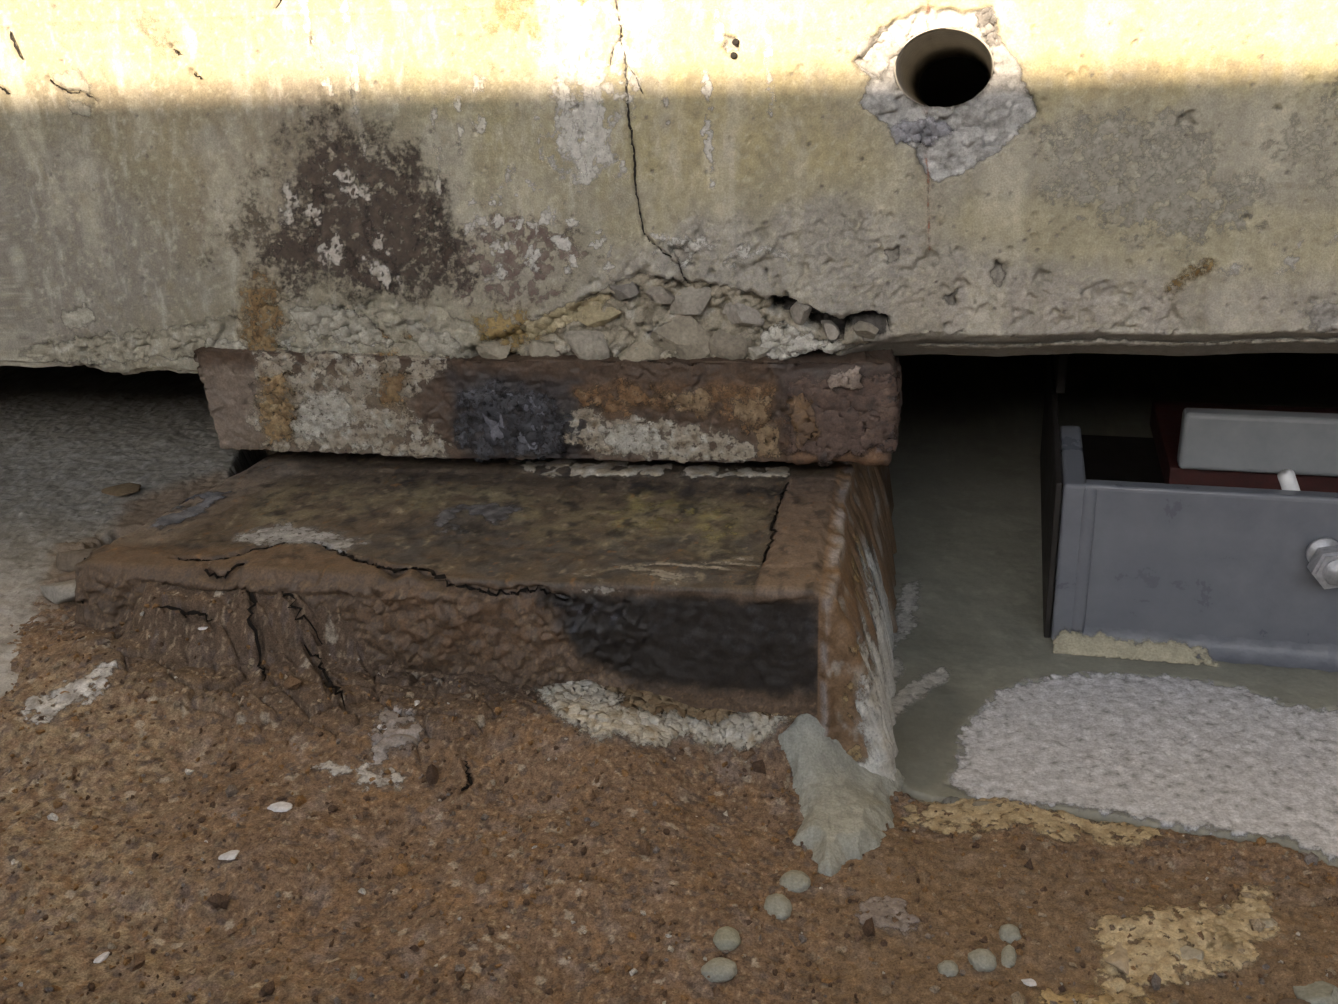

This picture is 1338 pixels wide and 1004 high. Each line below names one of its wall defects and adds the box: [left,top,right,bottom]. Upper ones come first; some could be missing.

crack [50,79,93,98]
spalling [855,6,1037,182]
damp [218,0,615,314]
crack [610,0,691,284]
corrosion [232,270,290,351]
spalling [19,272,889,366]
corrosion [255,372,297,446]
corrosion [507,377,791,479]
crack [762,482,789,563]
crack [158,605,213,622]
crack [178,542,568,710]